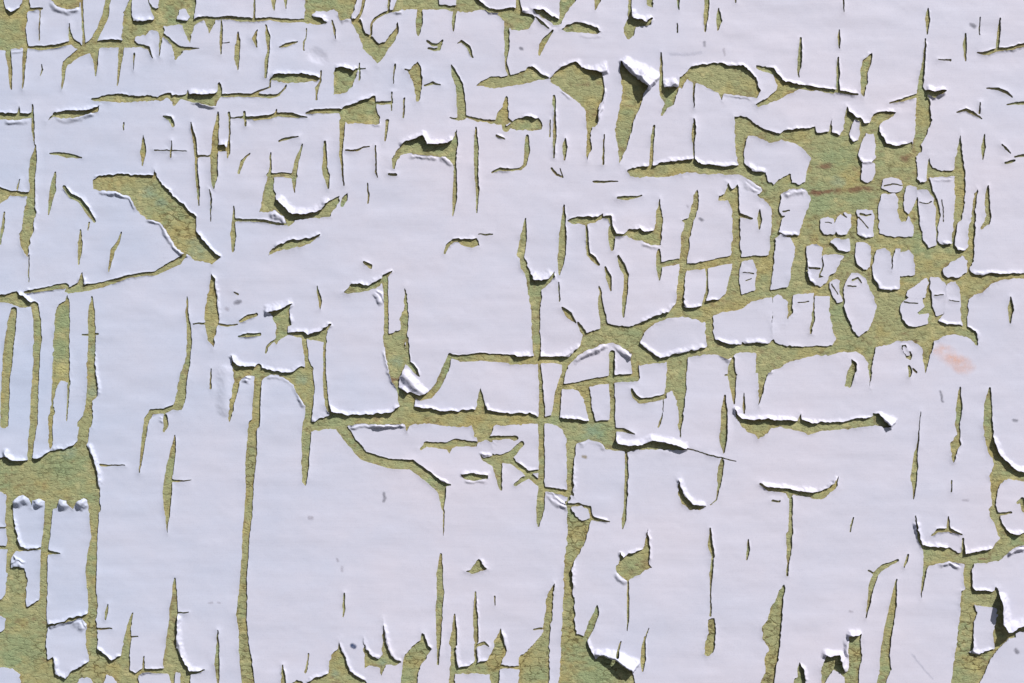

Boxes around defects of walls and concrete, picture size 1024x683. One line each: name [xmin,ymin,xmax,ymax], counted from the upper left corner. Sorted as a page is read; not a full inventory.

peeling [0,0,81,90]
peeling [121,0,199,60]
peeling [234,30,258,70]
peeling [624,0,654,39]
peeling [252,0,608,255]
peeling [48,172,56,215]
peeling [93,136,221,264]
peeling [108,232,122,272]
peeling [193,52,1024,683]
peeling [0,295,220,683]